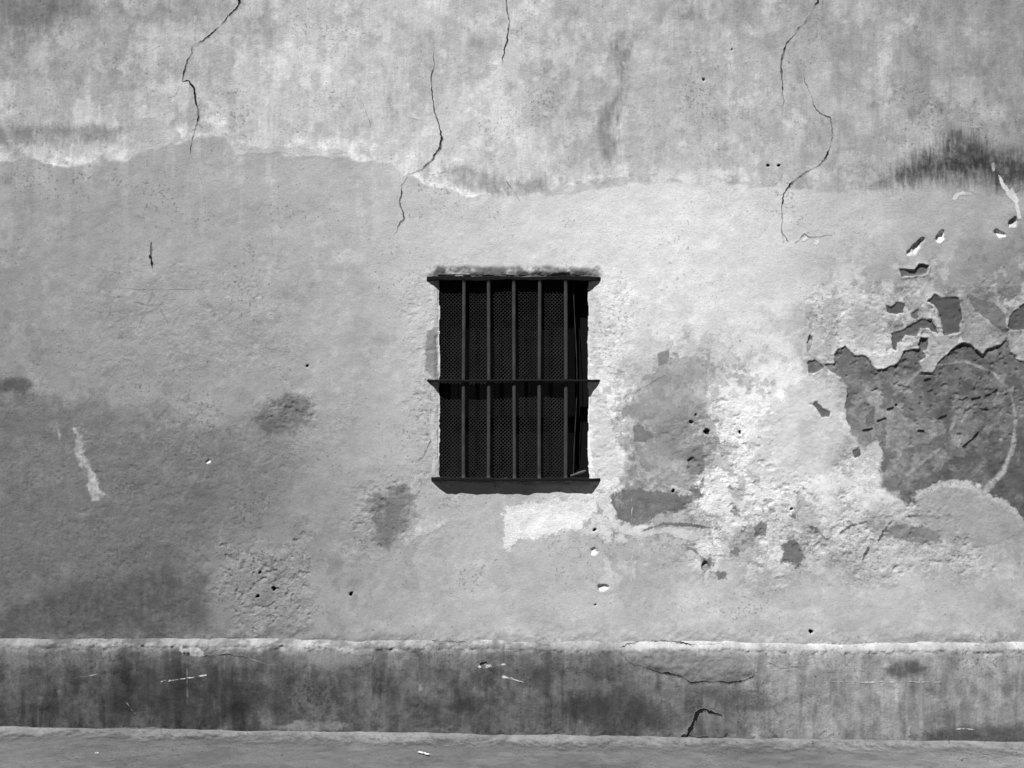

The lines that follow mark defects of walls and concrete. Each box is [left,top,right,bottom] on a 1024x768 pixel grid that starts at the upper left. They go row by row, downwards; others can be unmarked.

crack [182,0,241,206]
crack [780,0,833,245]
crack [391,58,443,250]
leakage [896,137,1024,186]
spalling [994,217,1017,238]
peeling [899,230,944,277]
peeling [806,294,1024,559]
leakage [370,485,412,544]
peeling [694,550,726,579]
leakage [889,661,921,675]
crack [678,708,722,738]
leakage [947,729,1022,742]